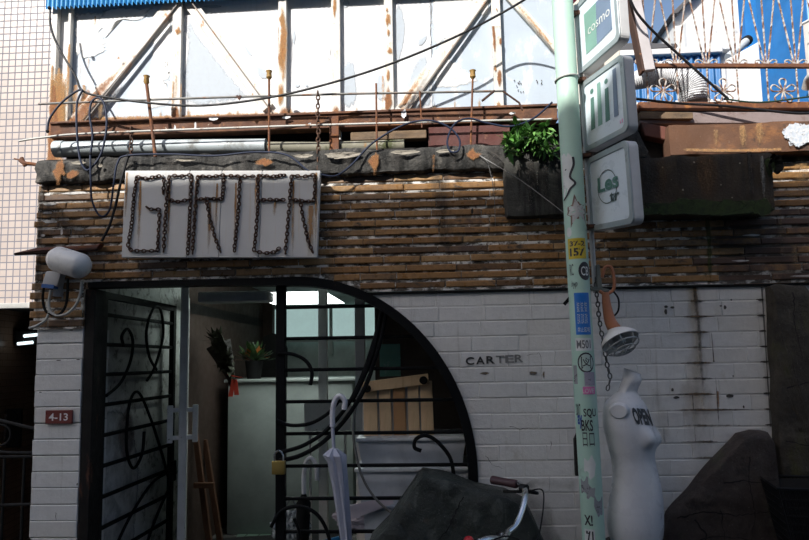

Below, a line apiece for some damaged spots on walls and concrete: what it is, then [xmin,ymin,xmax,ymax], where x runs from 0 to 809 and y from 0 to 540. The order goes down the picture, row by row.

peeling [74,7,150,58]
rust [47,10,305,182]
rust [382,70,424,110]
rust [688,125,781,152]